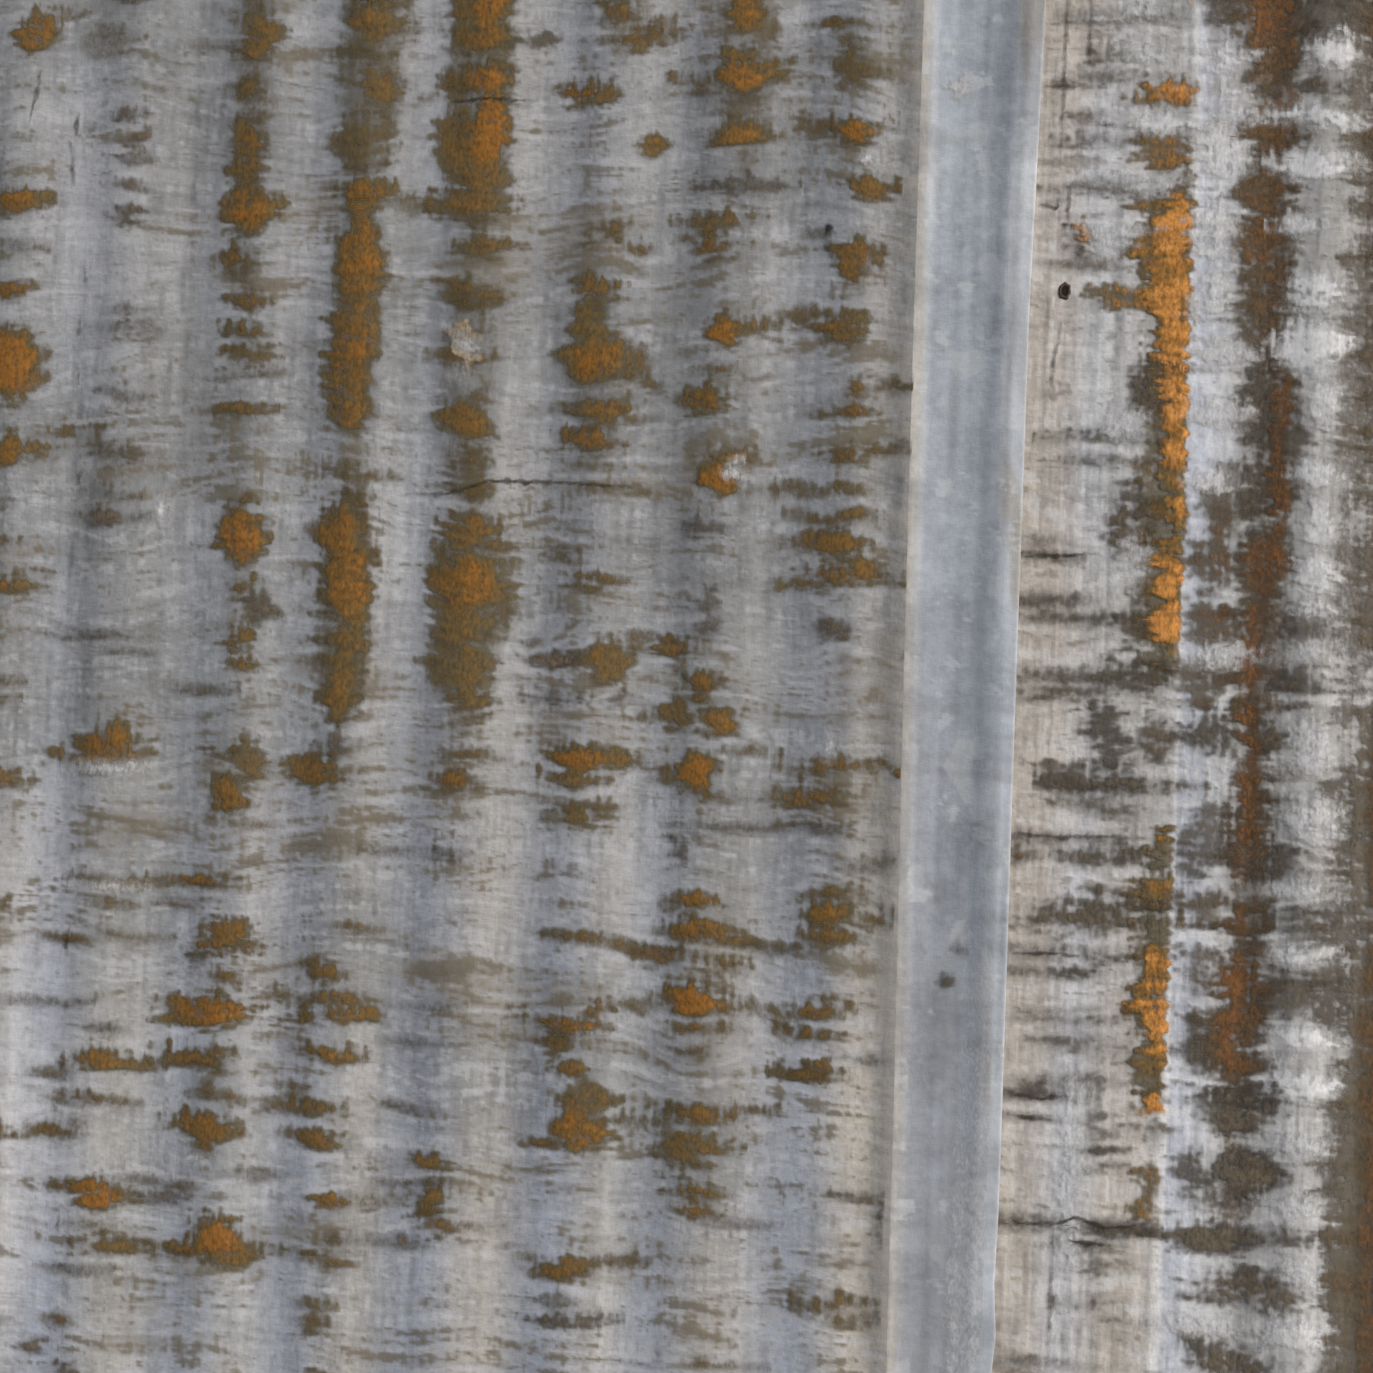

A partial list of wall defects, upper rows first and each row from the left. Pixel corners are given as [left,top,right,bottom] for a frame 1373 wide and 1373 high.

rust [214,3,293,273]
rust [318,0,531,435]
rust [551,269,658,466]
rust [305,461,396,726]
rust [414,342,524,727]
rust [770,442,911,592]
rust [1080,0,1318,1115]
rust [537,629,759,830]
rust [43,914,383,1157]
rust [516,888,858,1220]
rust [1319,703,1373,1373]
rust [45,1175,356,1271]